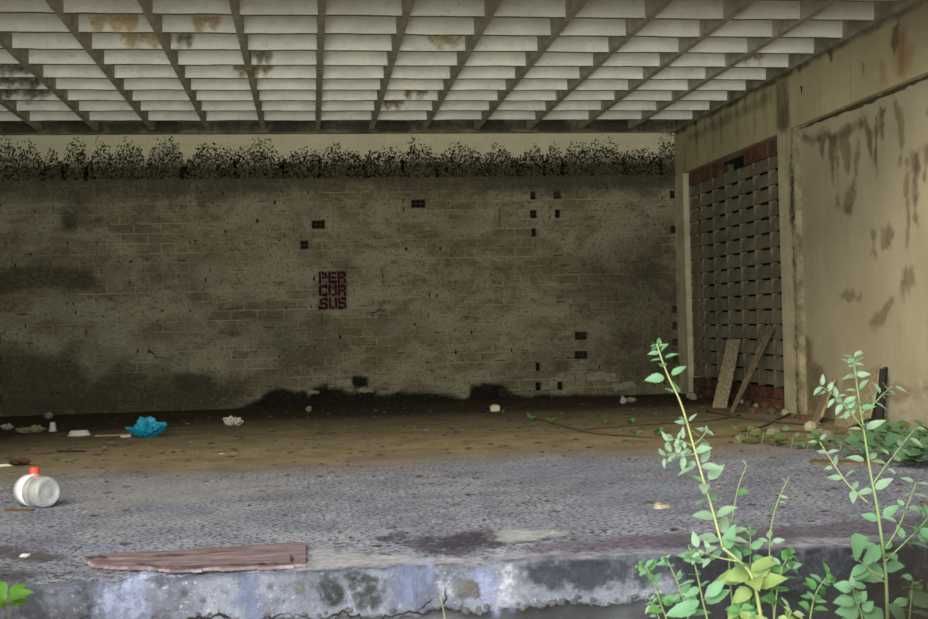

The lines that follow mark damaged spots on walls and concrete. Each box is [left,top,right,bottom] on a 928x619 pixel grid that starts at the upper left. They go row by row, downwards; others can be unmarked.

leakage [0,37,853,199]
leakage [0,350,586,416]
spalling [457,579,502,616]
spalling [515,593,666,611]